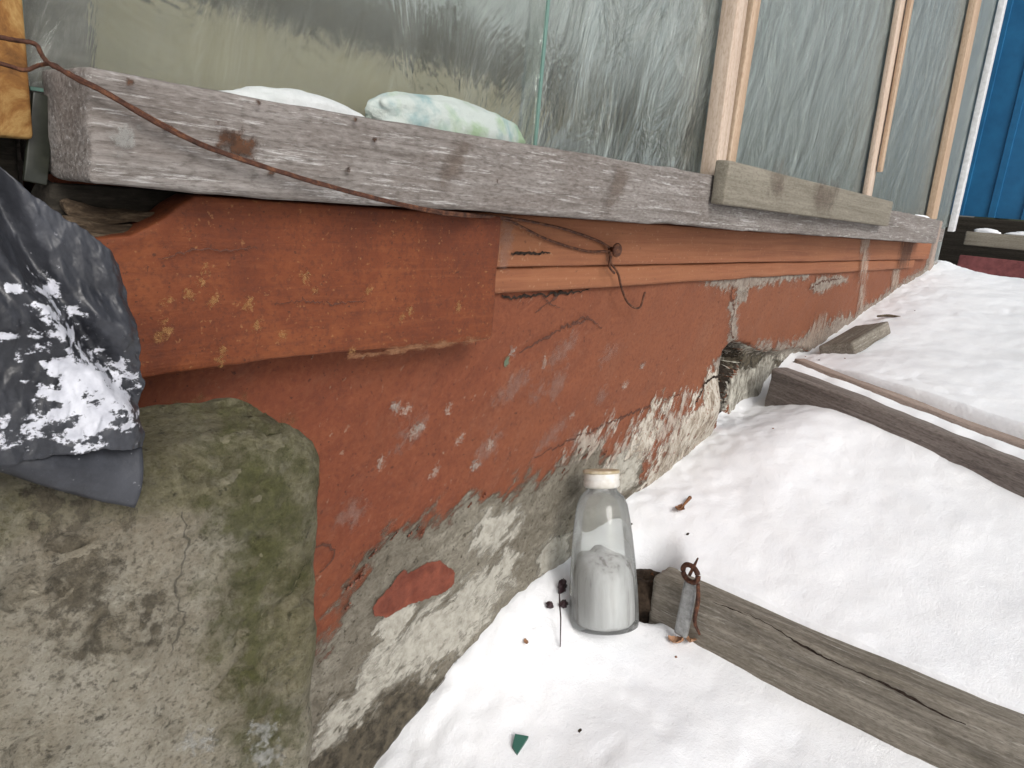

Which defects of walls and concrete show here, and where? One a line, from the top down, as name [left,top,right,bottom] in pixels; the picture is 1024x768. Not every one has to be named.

rust [215,129,258,160]
spalling [706,259,938,414]
peeling [308,439,647,768]